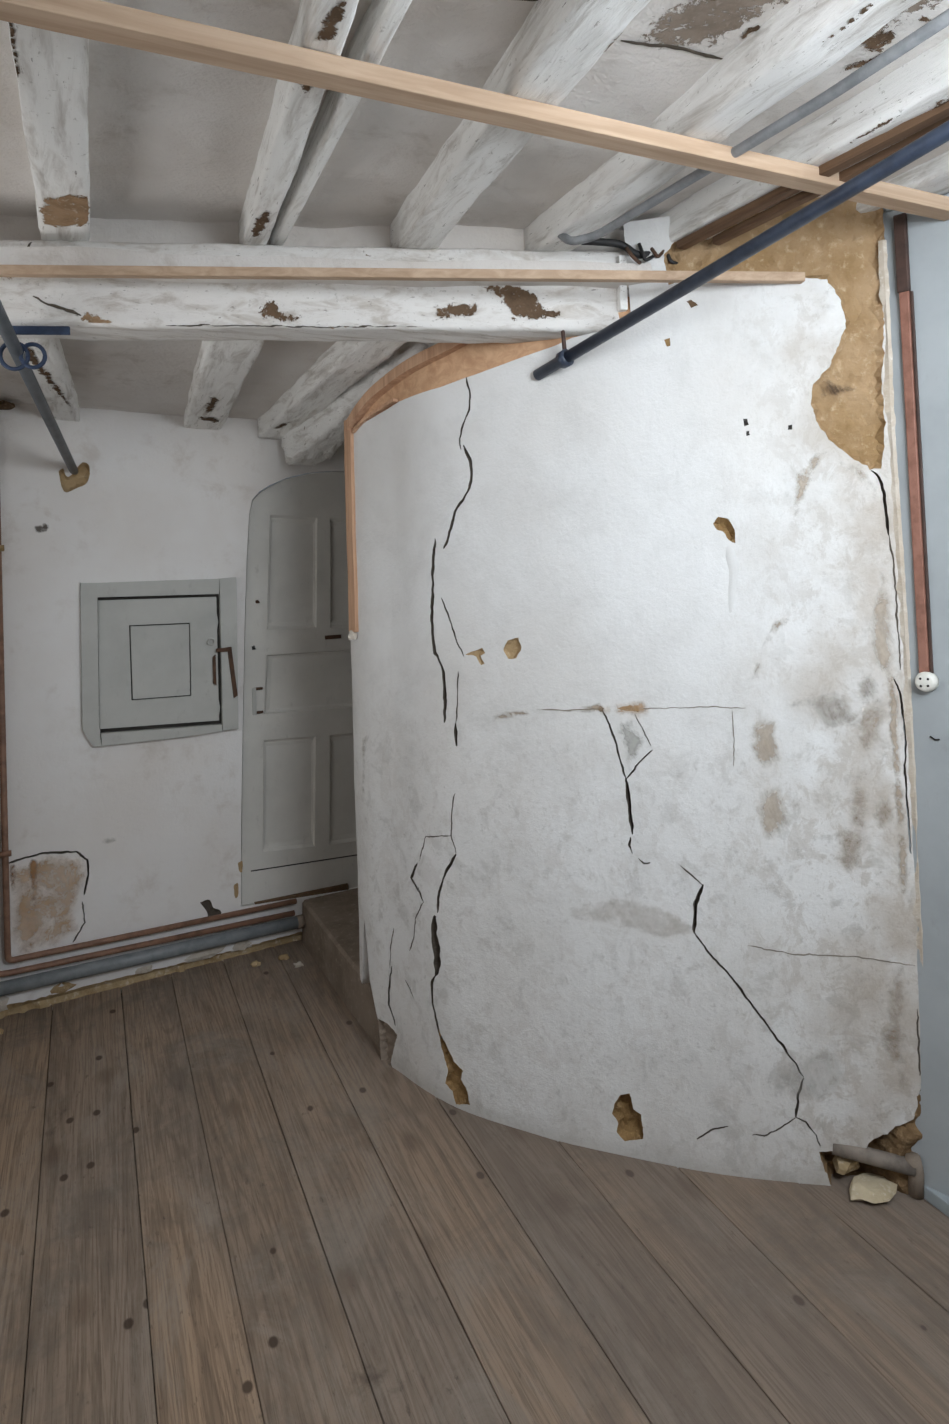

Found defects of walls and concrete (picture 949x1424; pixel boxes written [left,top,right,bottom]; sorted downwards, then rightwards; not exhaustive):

peeling [605,0,789,52]
peeling [436,302,477,318]
peeling [481,285,560,321]
spalling [664,197,886,470]
crack [430,377,473,746]
spalling [713,517,735,543]
crack [871,470,912,854]
crack [388,794,456,1039]
crack [541,706,915,1146]
crack [914,1009,922,1075]
spalling [612,1093,644,1141]
spalling [819,1089,923,1195]